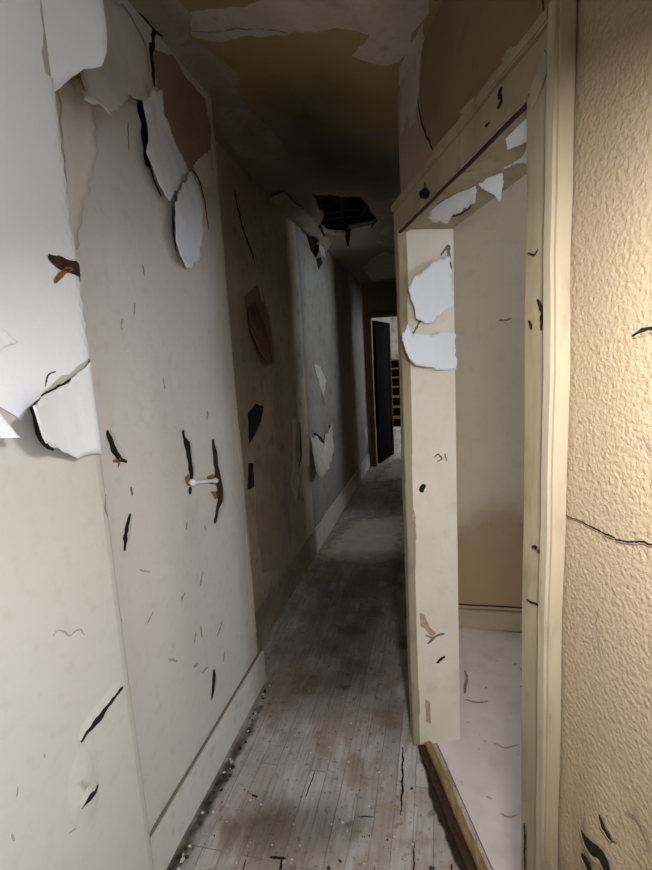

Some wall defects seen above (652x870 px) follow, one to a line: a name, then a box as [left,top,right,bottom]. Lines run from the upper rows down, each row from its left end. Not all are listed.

peeling [190,0,551,148]
peeling [428,119,527,224]
peeling [0,0,213,459]
spalling [270,189,397,281]
peeling [402,245,457,370]
peeling [528,299,543,330]
crack [106,430,128,467]
crack [104,487,133,551]
peeling [234,404,334,637]
crack [566,515,652,548]
spalling [580,817,610,870]
crack [598,814,617,843]